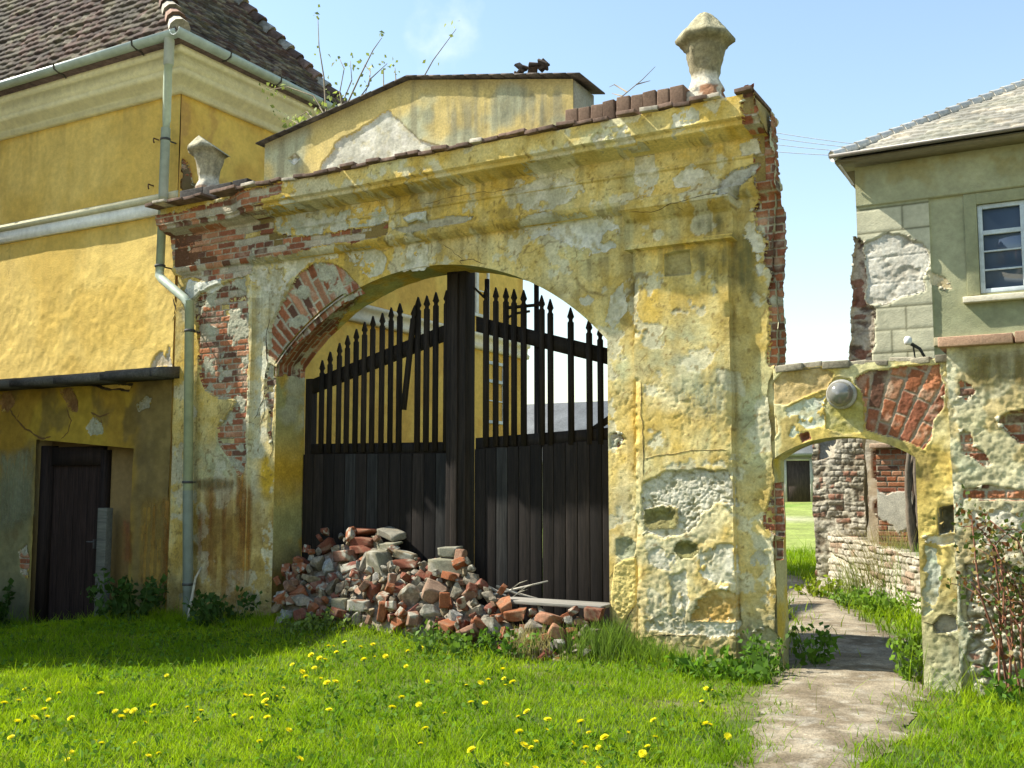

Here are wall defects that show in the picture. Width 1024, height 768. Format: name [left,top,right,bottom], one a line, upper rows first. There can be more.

spalling [321,110,436,170]
flaking render [670,83,788,366]
flaking render [155,182,474,476]
flaking render [848,233,975,449]
crack [10,407,109,441]
peeling [86,417,104,436]
crack [640,383,727,476]
flaking render [958,428,991,468]
flaking render [994,409,1024,444]
damp [198,479,233,489]
spalling [641,469,785,670]